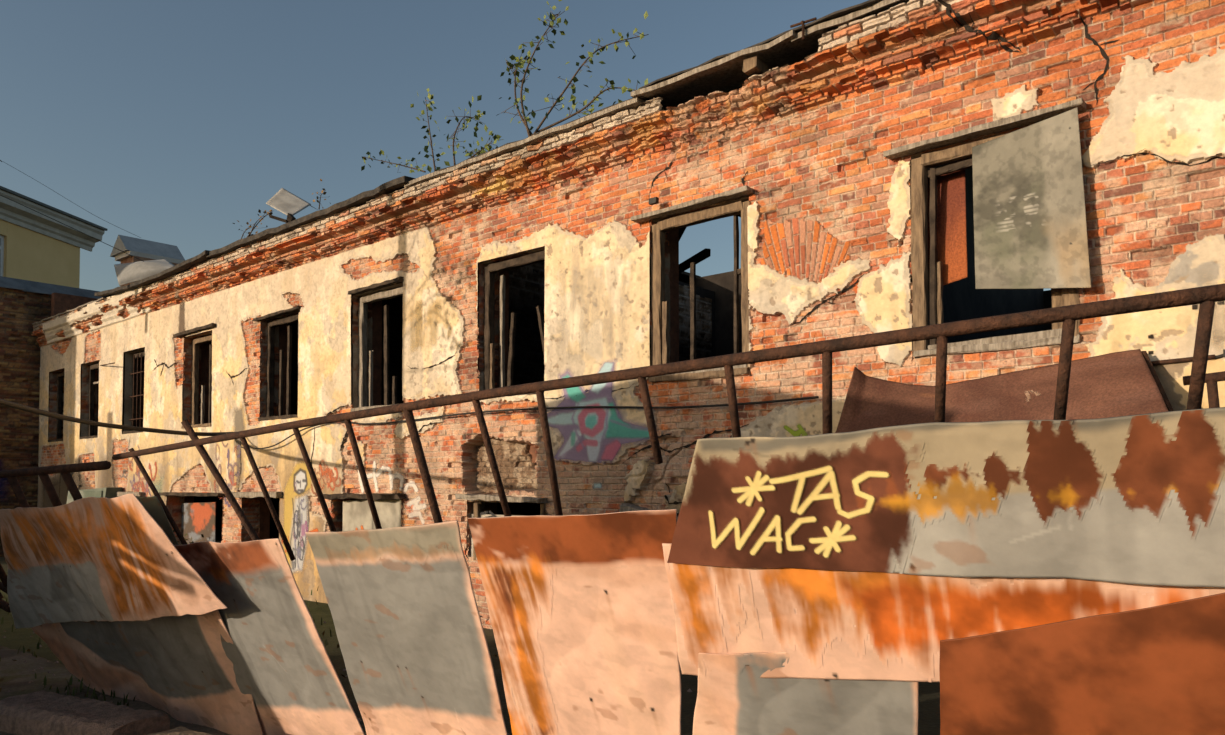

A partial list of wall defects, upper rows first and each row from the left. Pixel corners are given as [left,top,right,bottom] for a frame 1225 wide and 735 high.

crack [937,0,1023,53]
crack [1079,11,1120,105]
flaking render [172,328,187,388]
flaking render [241,315,262,426]
flaking render [308,0,1225,629]
rust [0,496,281,621]
rust [324,539,458,567]
rust [468,409,1225,735]